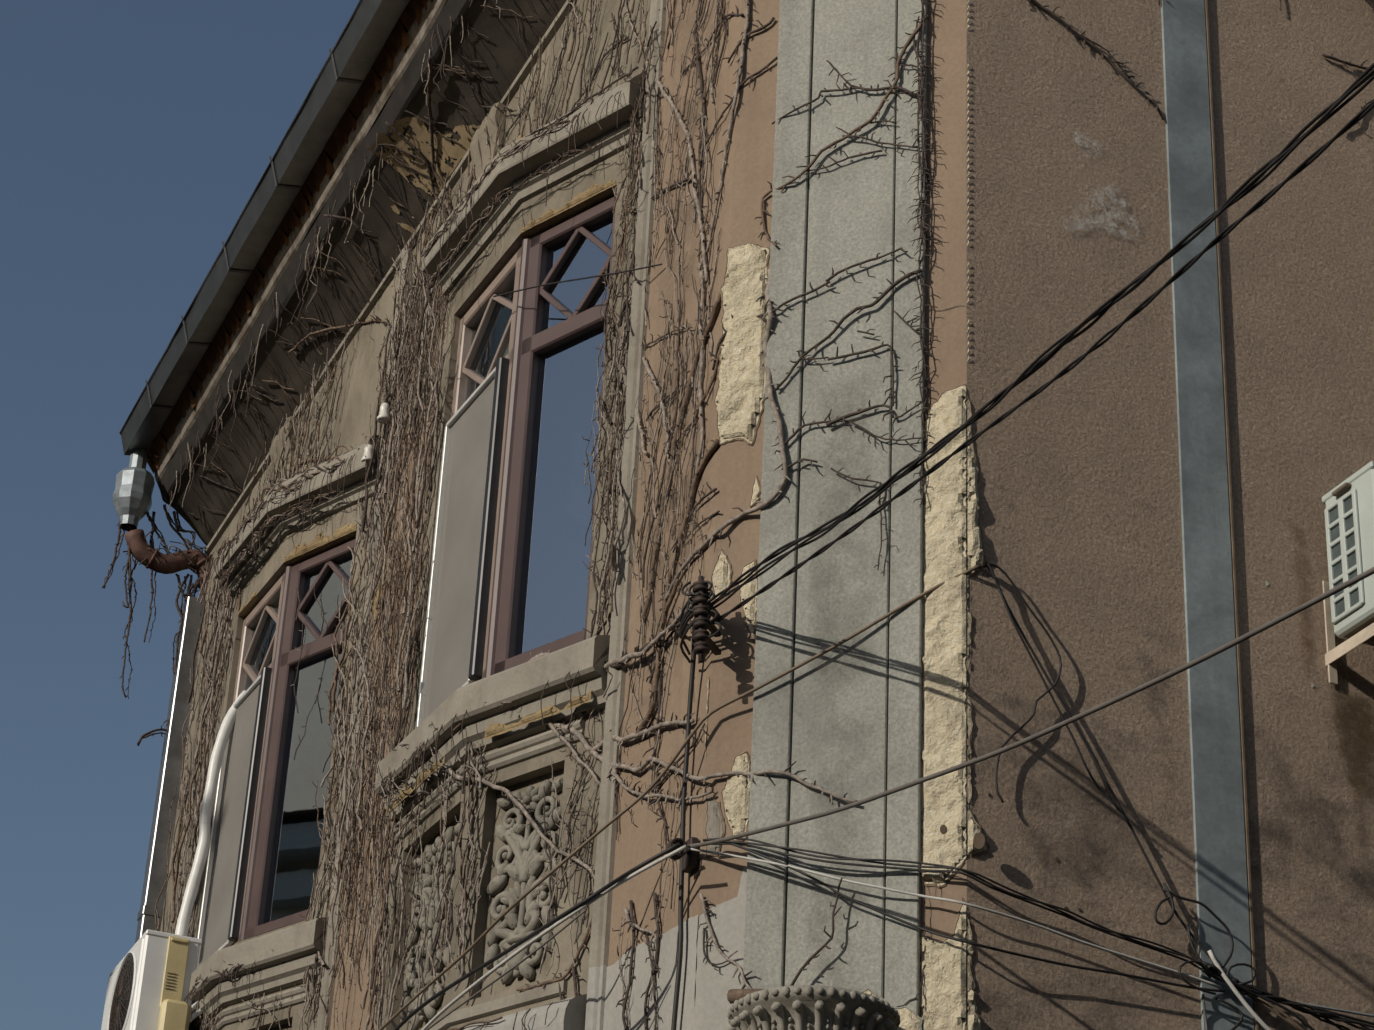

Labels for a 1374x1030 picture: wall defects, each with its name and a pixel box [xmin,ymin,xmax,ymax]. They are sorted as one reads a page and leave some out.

peeling [367,116,481,196]
peeling [713,242,770,445]
peeling [711,549,758,642]
peeling [920,384,989,888]
peeling [862,897,983,1030]